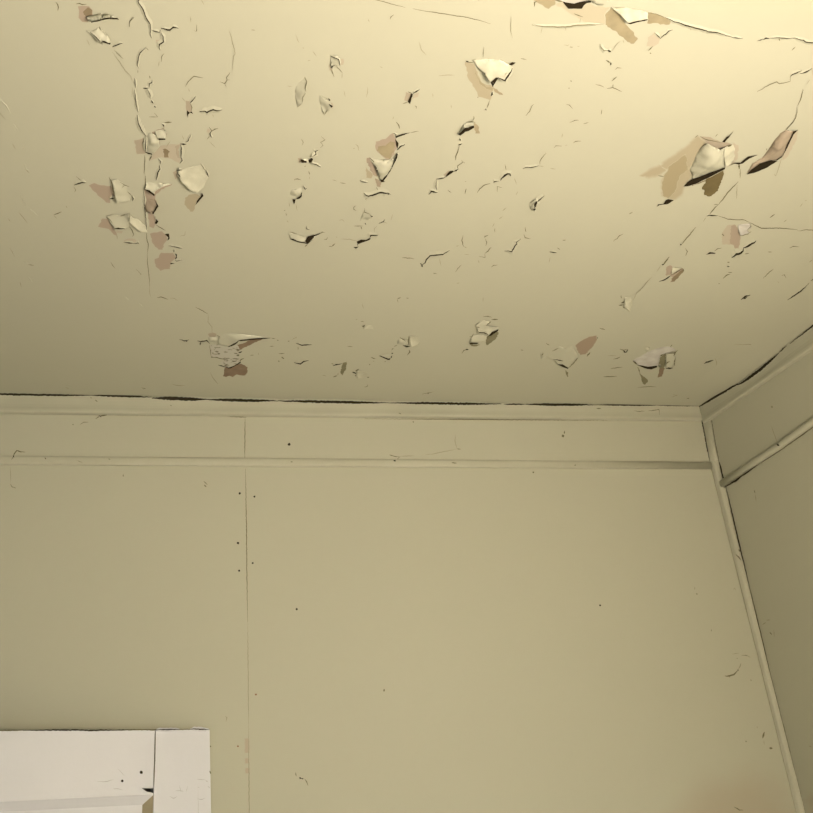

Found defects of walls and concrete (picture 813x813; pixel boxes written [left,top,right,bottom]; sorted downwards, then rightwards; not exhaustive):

peeling [77,3,123,58]
peeling [532,0,673,54]
crack [652,13,813,50]
peeling [98,122,209,271]
crack [112,0,212,327]
crack [178,76,222,164]
crack [325,179,392,250]
peeling [365,117,417,187]
peeling [465,50,515,110]
peeling [638,119,798,206]
crack [634,182,813,300]
crack [0,325,813,813]